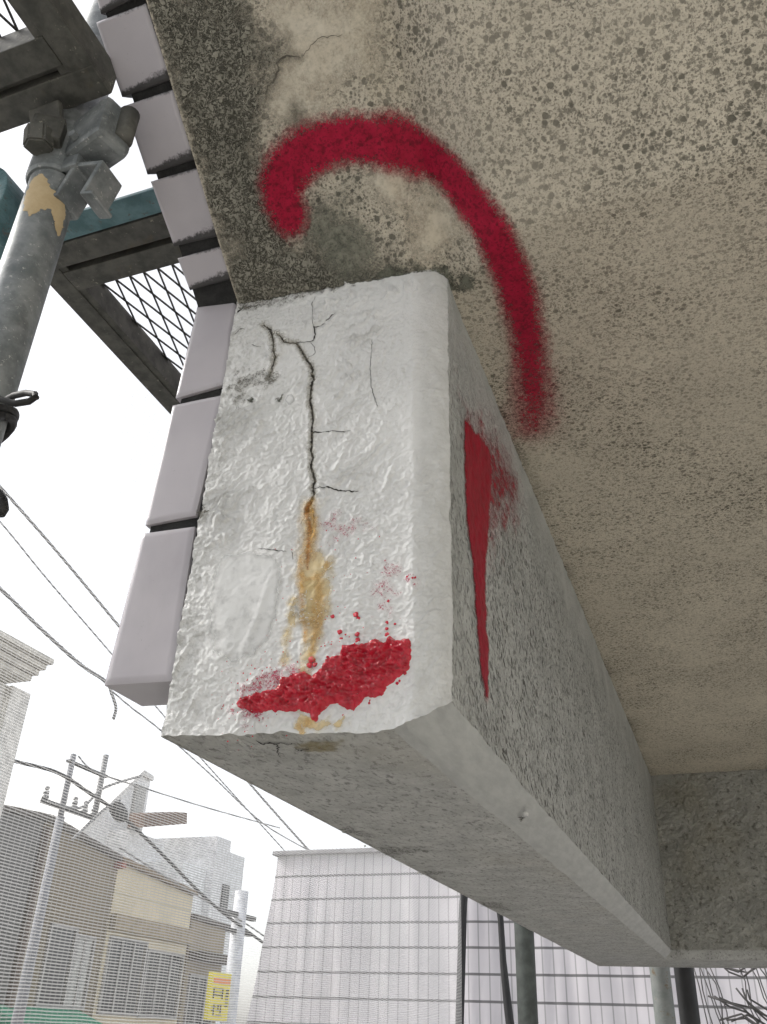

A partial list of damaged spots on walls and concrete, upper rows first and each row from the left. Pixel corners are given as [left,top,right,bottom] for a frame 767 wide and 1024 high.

crack [263,35,341,100]
leakage [149,0,476,310]
crack [235,302,358,568]
corrosion [284,502,332,670]
corrosion [294,715,344,752]